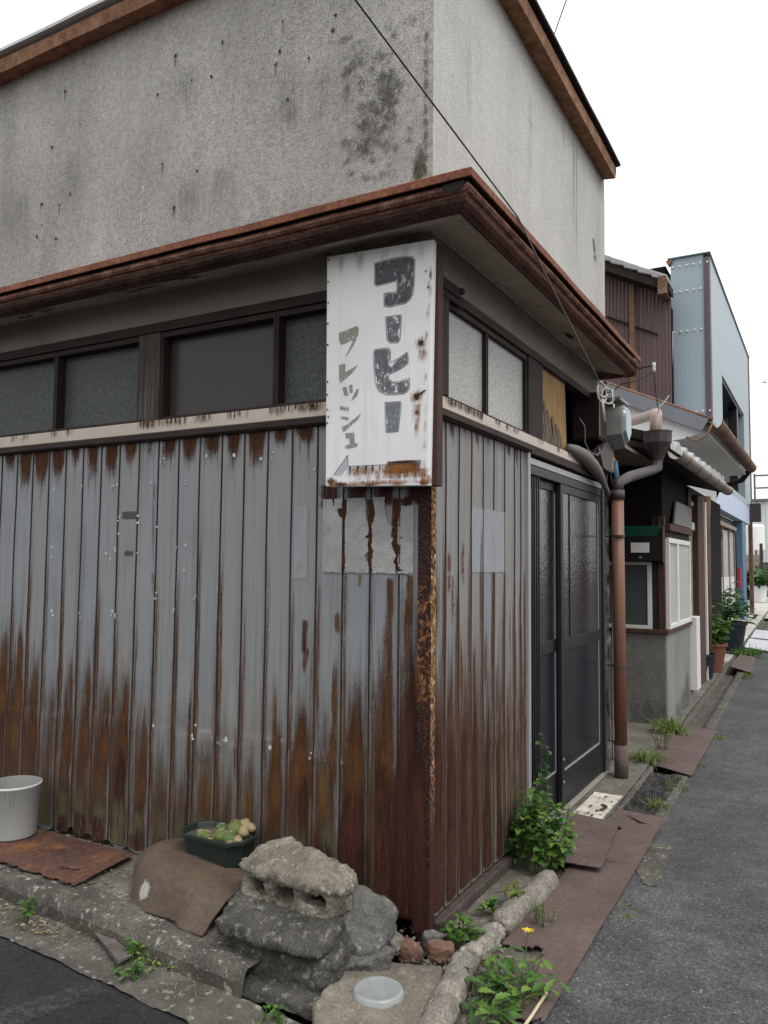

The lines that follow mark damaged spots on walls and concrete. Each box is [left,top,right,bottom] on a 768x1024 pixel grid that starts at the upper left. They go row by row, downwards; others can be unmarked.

damp [339,33,428,179]
rust [6,443,136,486]
rust [150,427,314,464]
rust [0,460,432,920]
rust [434,543,527,913]